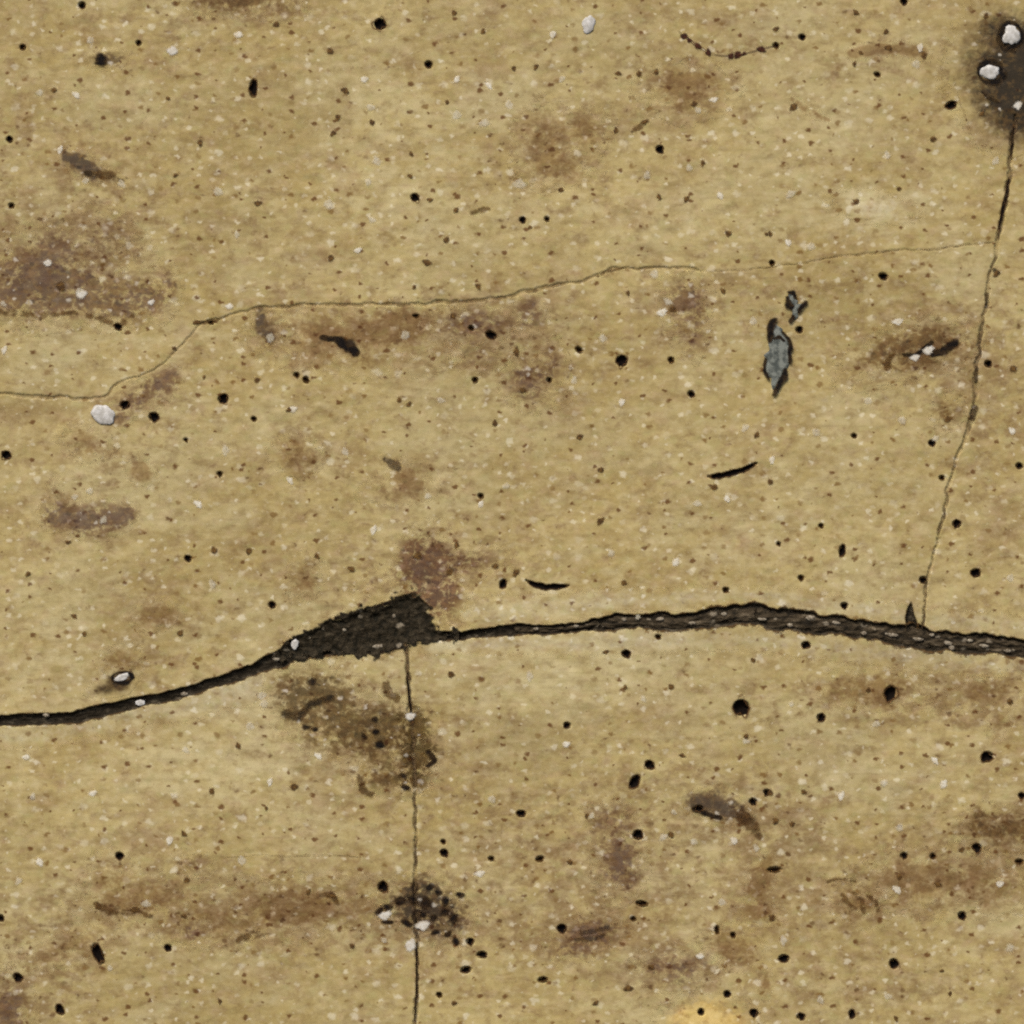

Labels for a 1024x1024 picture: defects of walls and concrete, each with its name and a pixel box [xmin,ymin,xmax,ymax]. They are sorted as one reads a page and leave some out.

crack [680,32,774,59]
damp [846,0,1024,160]
crack [182,315,228,345]
crack [337,300,404,308]
crack [435,267,679,304]
crack [883,119,1018,430]
crack [938,466,956,534]
crack [0,638,339,748]
crack [404,578,1024,1023]